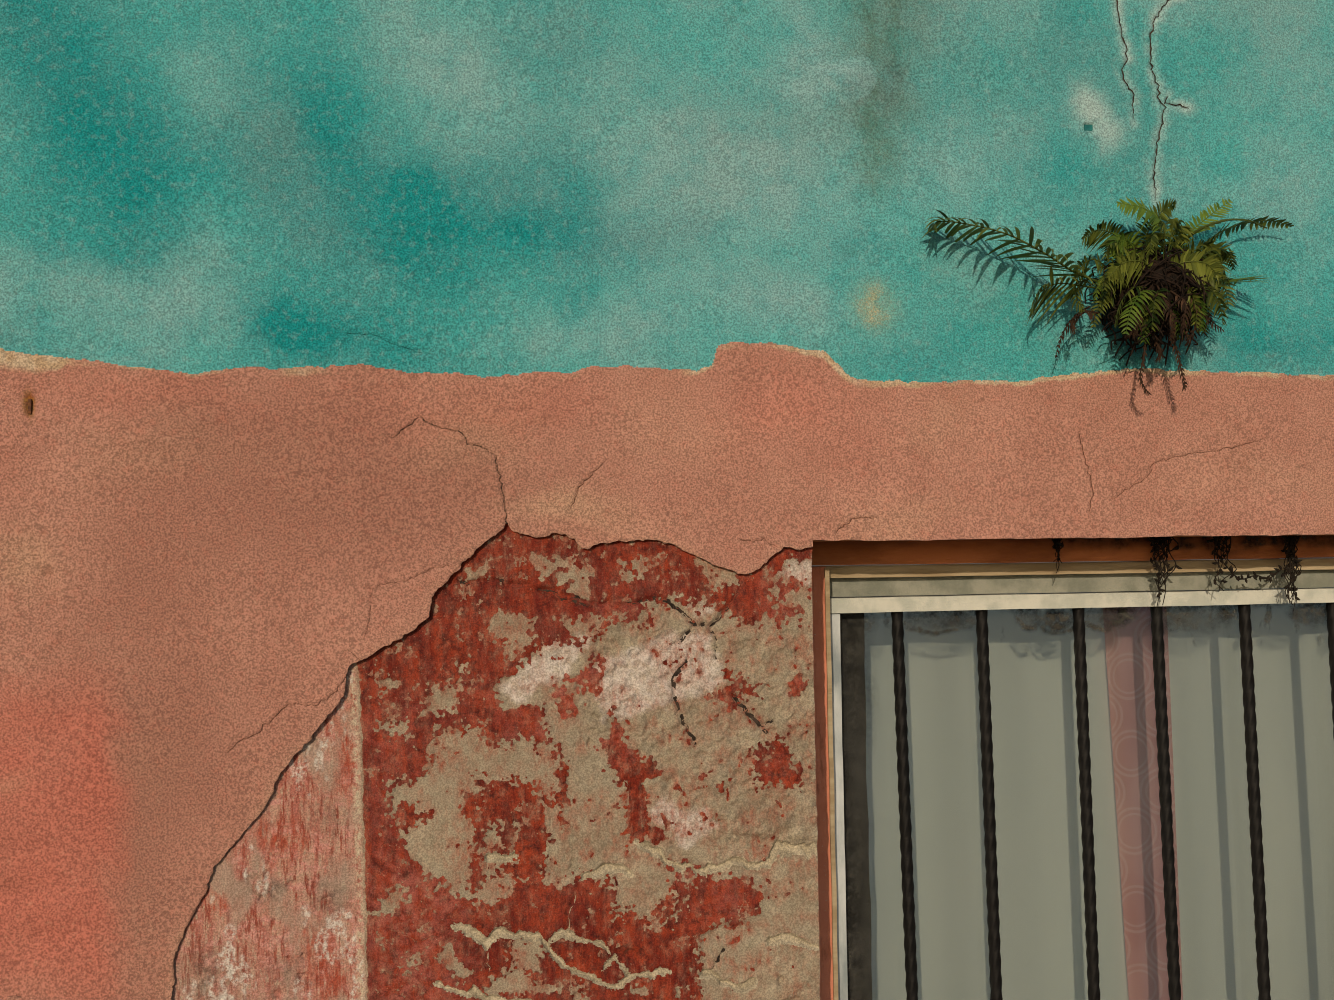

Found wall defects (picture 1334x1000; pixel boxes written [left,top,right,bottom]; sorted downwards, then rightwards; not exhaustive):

crack [1116,0,1189,199]
crack [388,417,507,524]
crack [538,589,590,607]
crack [627,592,740,745]
spalling [172,523,820,1000]
crack [407,839,819,1000]